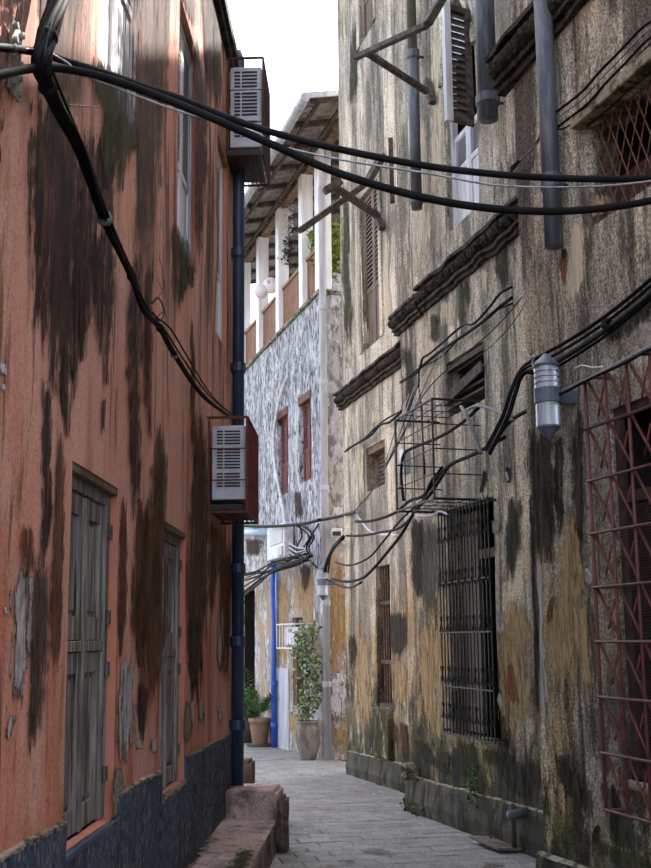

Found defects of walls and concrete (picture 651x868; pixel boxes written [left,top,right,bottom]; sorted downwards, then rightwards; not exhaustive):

damp [130,0,180,90]
damp [184,0,226,109]
damp [348,25,359,106]
damp [20,97,117,753]
damp [52,0,168,742]
damp [171,118,209,306]
damp [341,202,353,372]
damp [429,315,439,342]
peeling [4,568,34,740]
peeling [111,657,158,820]
damp [410,519,445,617]
damp [503,409,584,732]